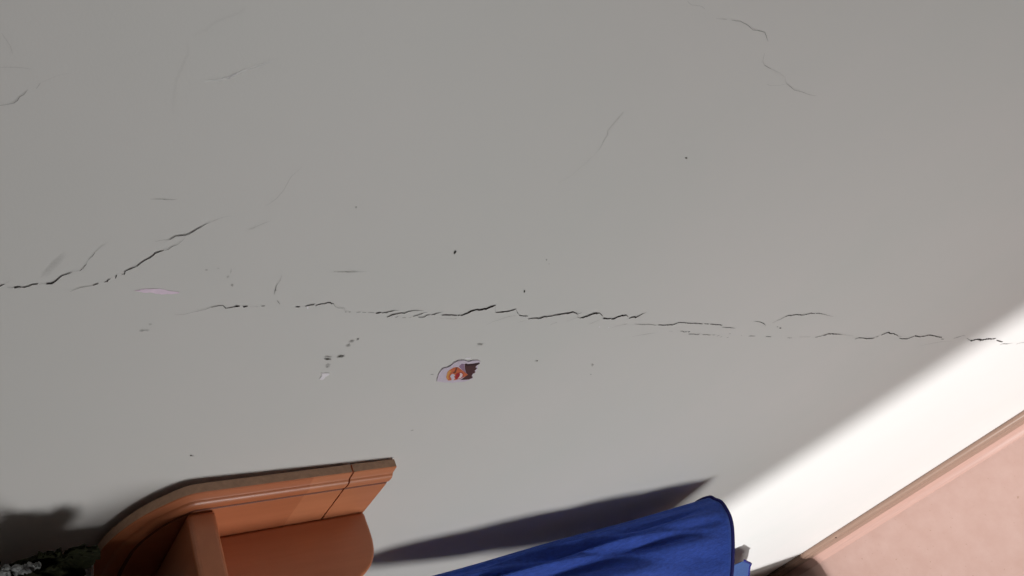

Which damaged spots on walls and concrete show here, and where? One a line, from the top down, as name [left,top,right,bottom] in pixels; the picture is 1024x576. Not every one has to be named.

crack [0,225,204,288]
crack [357,305,731,335]
crack [756,313,942,339]